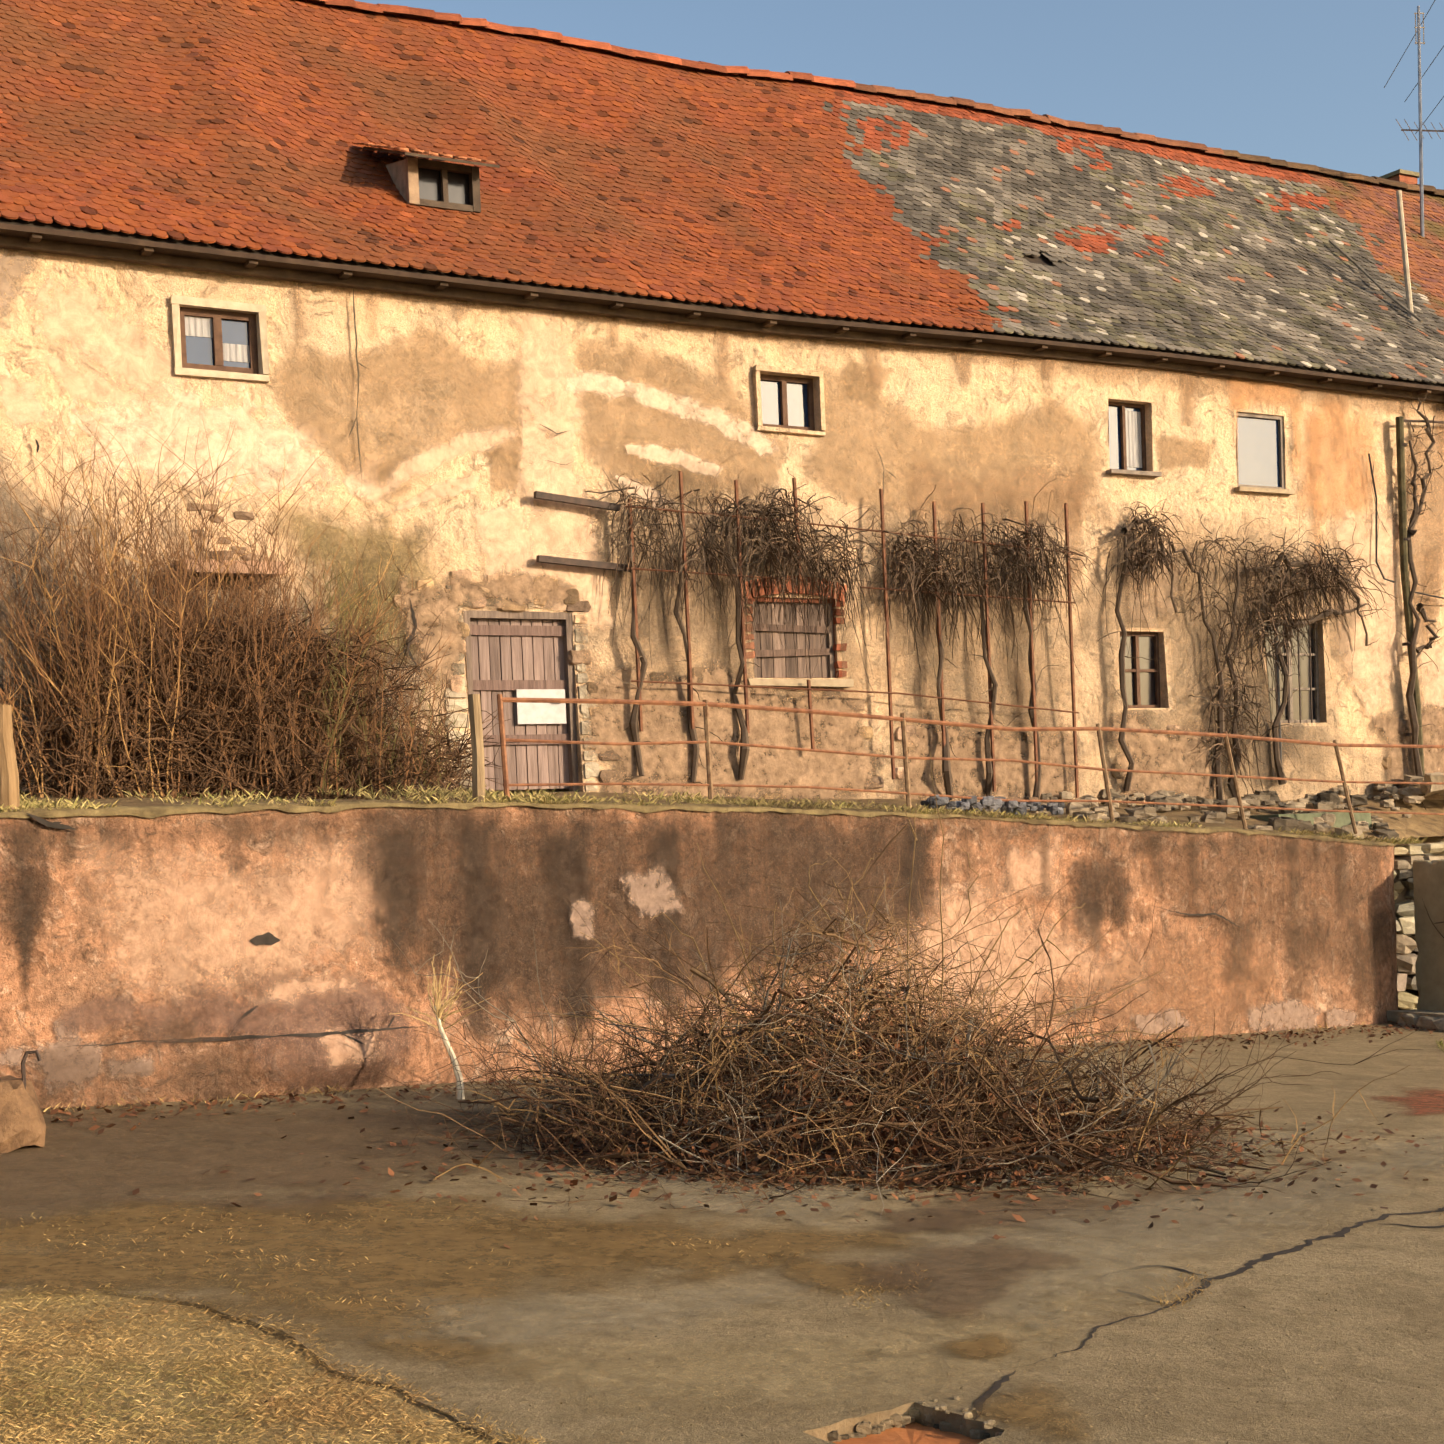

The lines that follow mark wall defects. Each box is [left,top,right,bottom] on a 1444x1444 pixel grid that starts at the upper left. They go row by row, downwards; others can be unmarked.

damp [0,248,34,308]
damp [0,379,43,423]
damp [37,283,178,416]
damp [278,332,525,517]
damp [567,351,779,510]
damp [812,363,1095,512]
damp [1160,439,1209,467]
damp [0,485,1190,1226]
efflorescence [1248,999,1356,1032]
damp [870,1162,1358,1315]
crack [974,1207,1444,1420]
hole [802,1396,1010,1444]